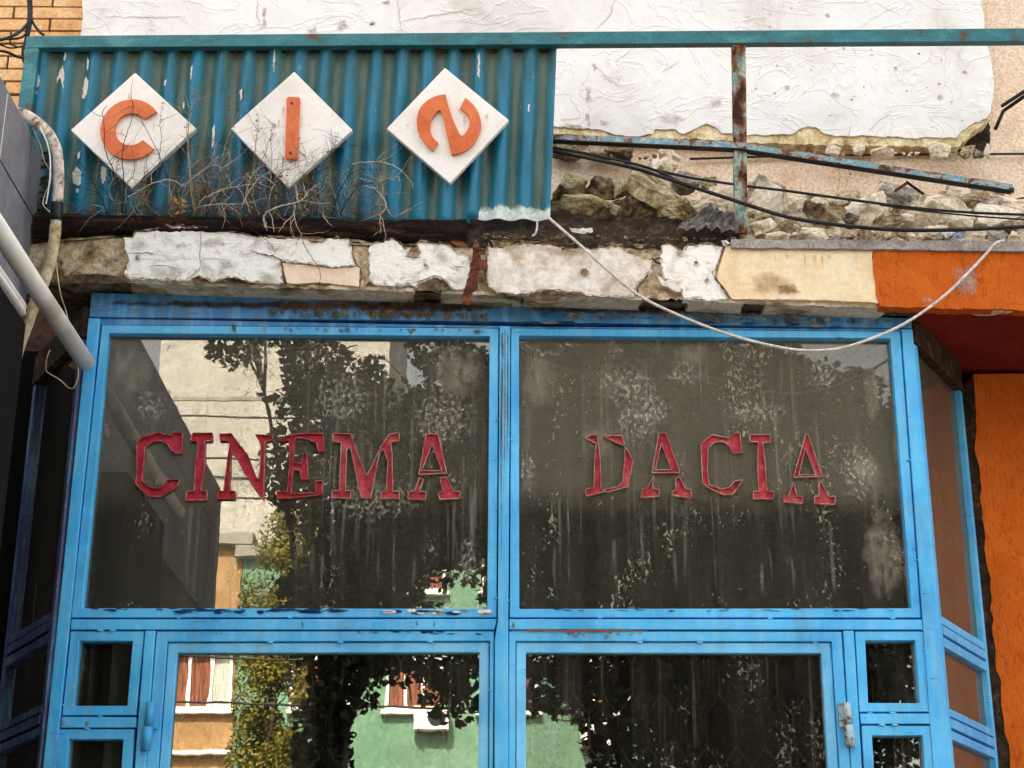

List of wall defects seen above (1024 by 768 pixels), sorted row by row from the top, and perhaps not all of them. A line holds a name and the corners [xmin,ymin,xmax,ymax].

spalling [957,121,991,153]
peeling [475,205,550,221]
corrosion [113,238,492,333]
peeling [59,224,884,327]
corrosion [532,307,797,322]